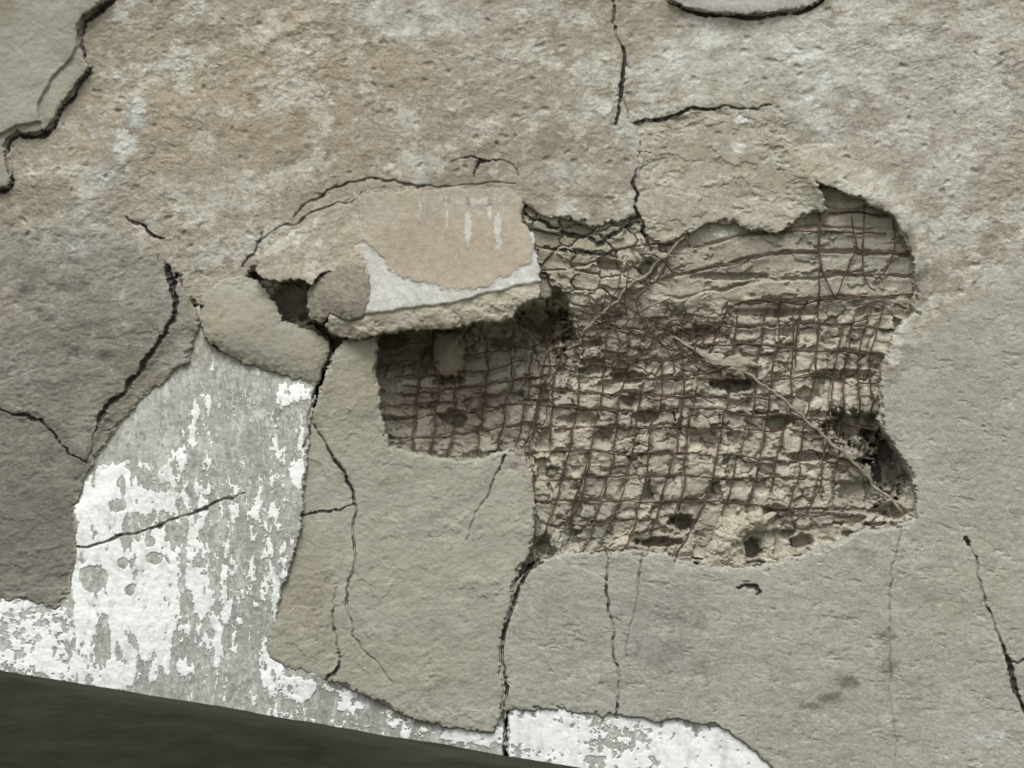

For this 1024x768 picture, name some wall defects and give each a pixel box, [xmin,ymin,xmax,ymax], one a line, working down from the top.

crack [0,0,117,194]
crack [523,0,771,258]
crack [667,0,824,20]
crack [126,217,164,239]
crack [0,266,179,463]
crack [78,493,245,548]
crack [301,320,393,682]
flaking render [0,184,915,768]
crack [501,560,543,756]
crack [604,548,644,715]
crack [965,538,1024,713]